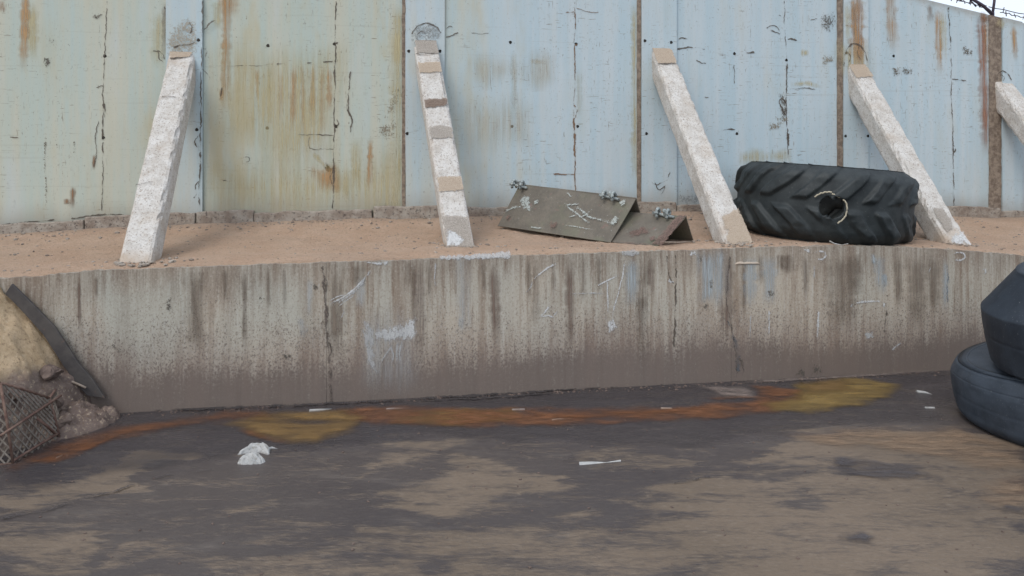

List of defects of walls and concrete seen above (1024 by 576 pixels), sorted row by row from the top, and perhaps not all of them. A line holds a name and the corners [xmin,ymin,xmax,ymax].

rust [848,1,863,65]
rust [978,14,989,140]
crack [182,266,617,410]
water stain [483,276,499,324]
water stain [541,264,636,332]
crack [726,257,744,371]
rust [211,378,894,440]